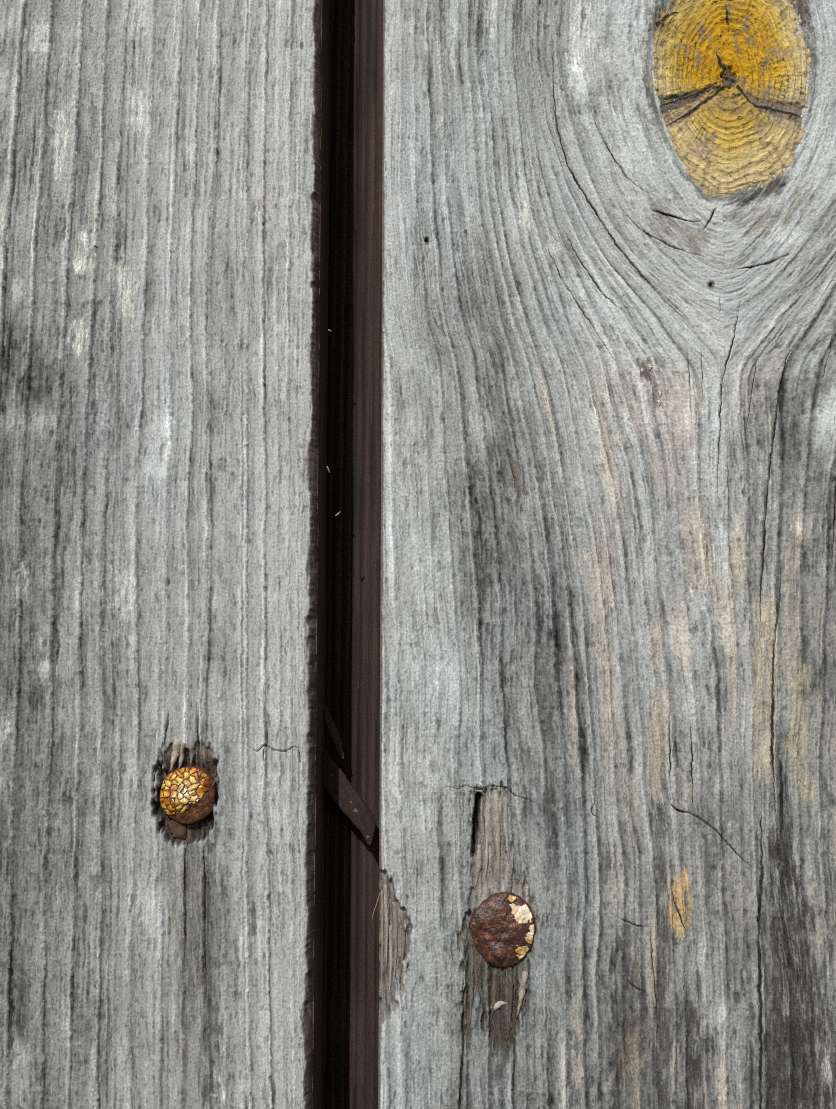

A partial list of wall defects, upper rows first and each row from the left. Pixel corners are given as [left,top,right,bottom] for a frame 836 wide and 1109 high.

crack [655,11,680,25]
crack [545,44,803,1109]
crack [441,785,539,805]